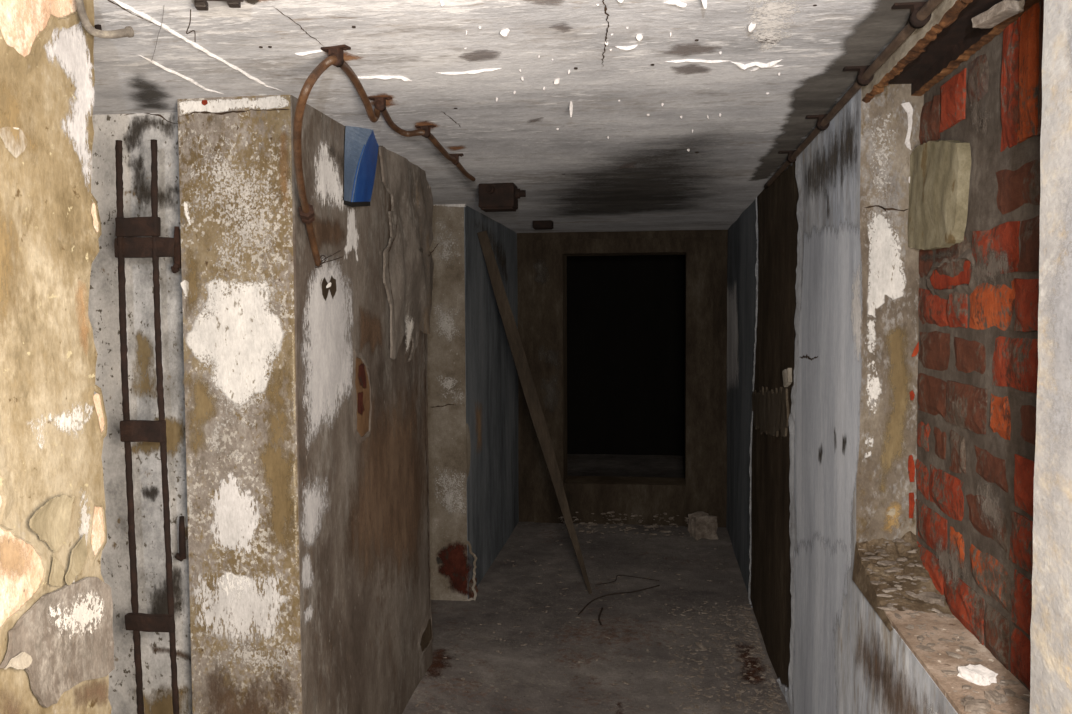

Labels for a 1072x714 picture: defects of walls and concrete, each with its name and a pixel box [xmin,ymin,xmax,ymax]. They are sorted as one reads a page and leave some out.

flaking render [0,0,87,76]
crack [601,0,609,63]
damp [186,249,199,309]
spalling [88,385,108,441]
damp [260,351,296,550]
flaking render [0,414,115,708]